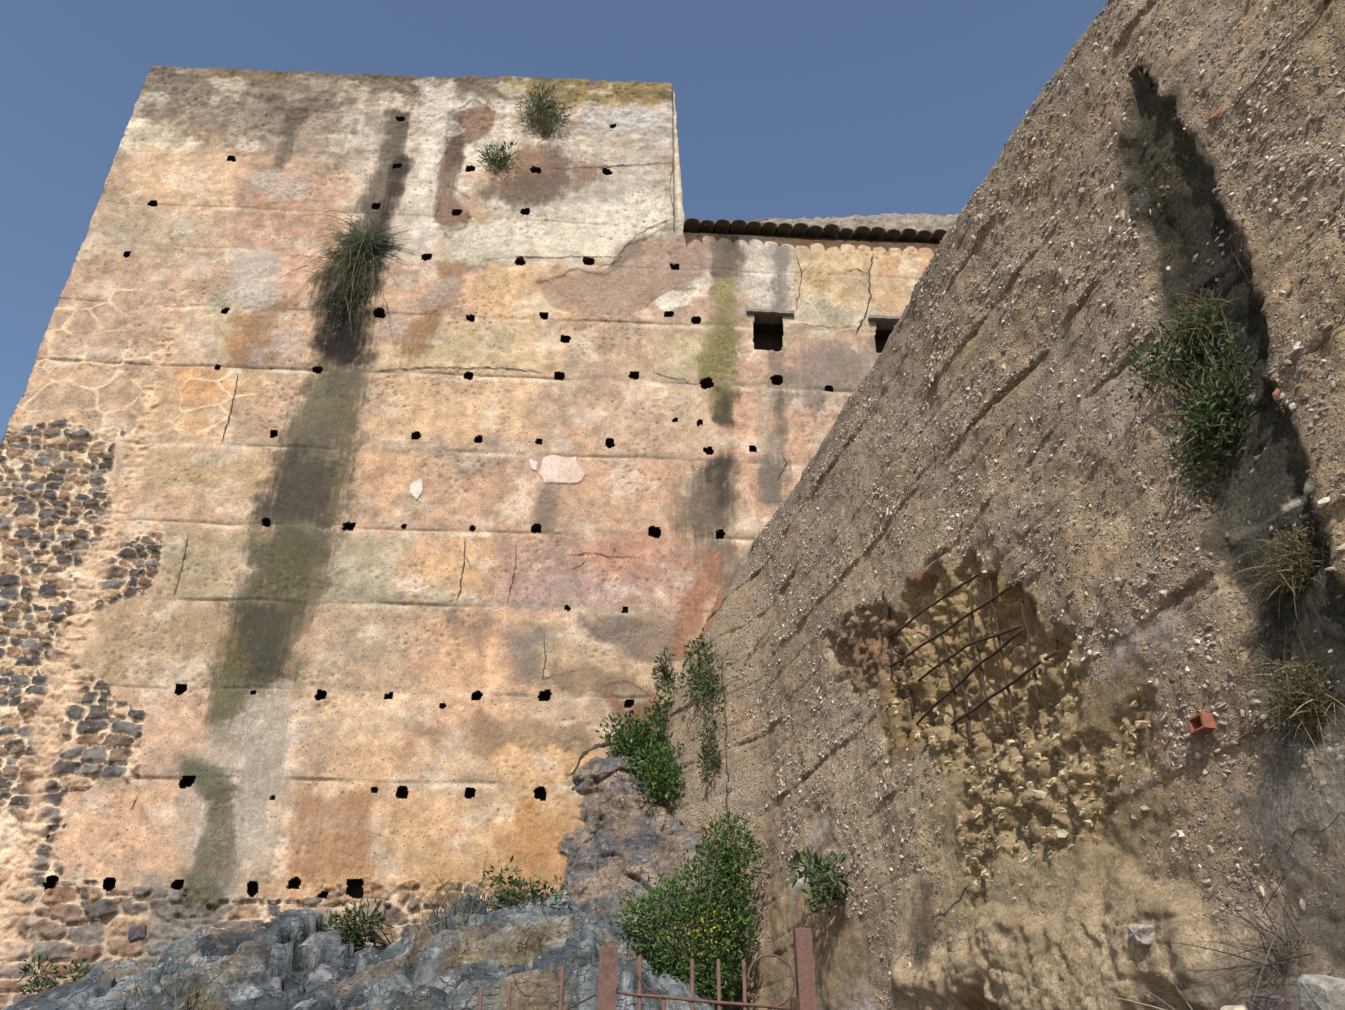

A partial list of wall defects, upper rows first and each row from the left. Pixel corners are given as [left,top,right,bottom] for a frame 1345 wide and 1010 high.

water stain [578,106,668,132]
water stain [711,234,745,276]
crack [221,372,238,443]
water stain [712,388,734,425]
water stain [758,338,880,502]
water stain [136,82,519,963]
water stain [674,453,741,585]
water stain [1111,63,1345,964]
spalling [836,556,1158,919]